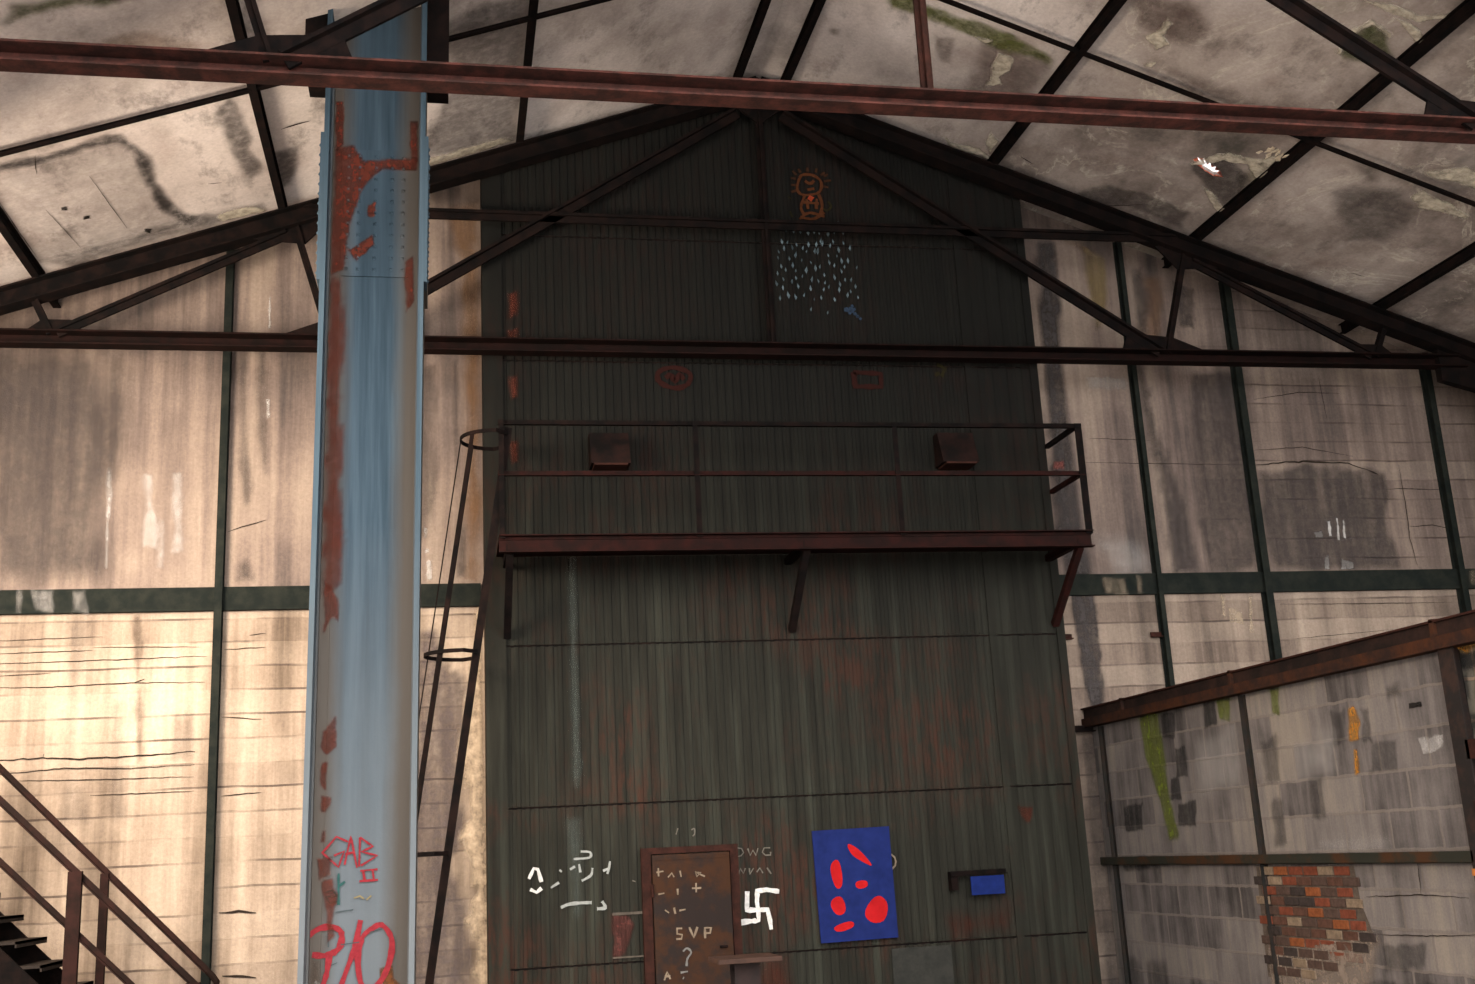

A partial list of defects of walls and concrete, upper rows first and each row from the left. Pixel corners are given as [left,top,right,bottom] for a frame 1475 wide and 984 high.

water stain [0,136,194,223]
rust [323,102,418,631]
water stain [1139,366,1397,572]
rust [321,718,336,811]
rust [318,858,337,940]
flaking render [1254,866,1377,984]